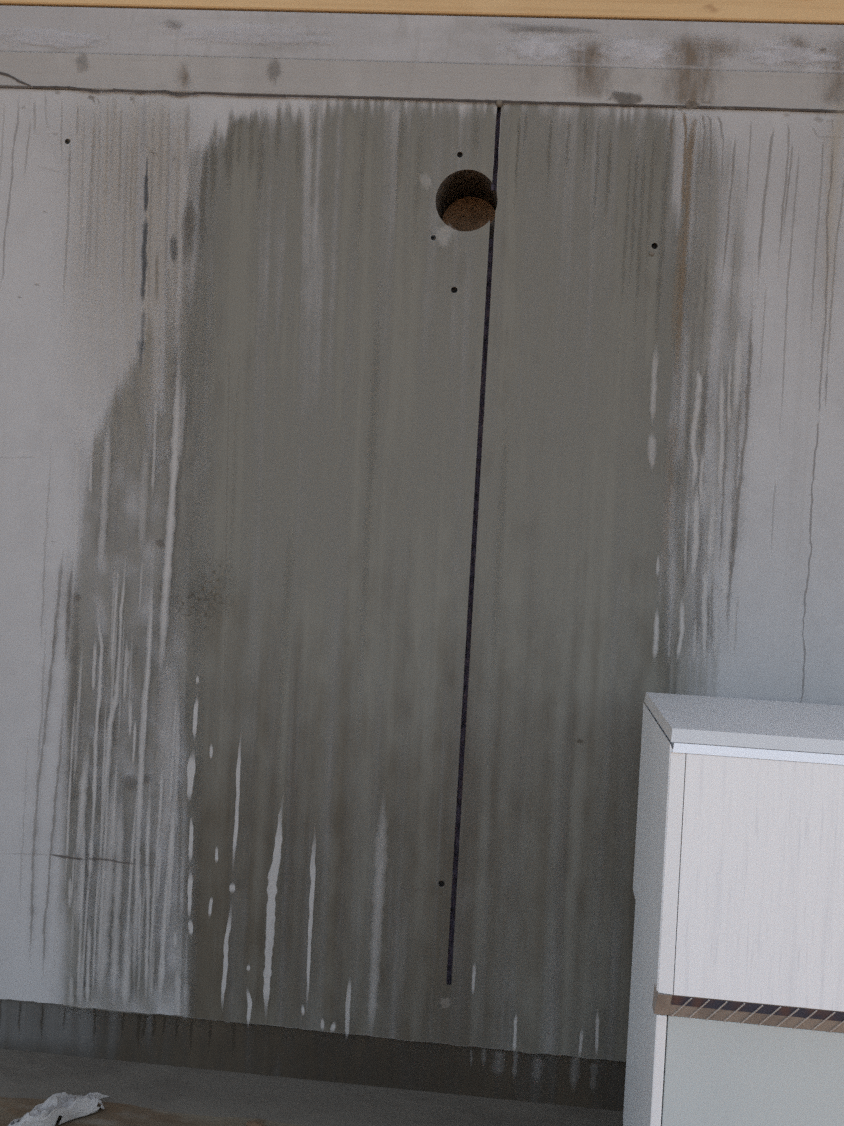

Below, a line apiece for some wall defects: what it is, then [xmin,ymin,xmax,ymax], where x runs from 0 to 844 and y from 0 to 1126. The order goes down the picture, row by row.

leakage [30,92,752,1111]
leakage [759,135,773,259]
leakage [780,129,798,279]
crack [801,158,833,700]